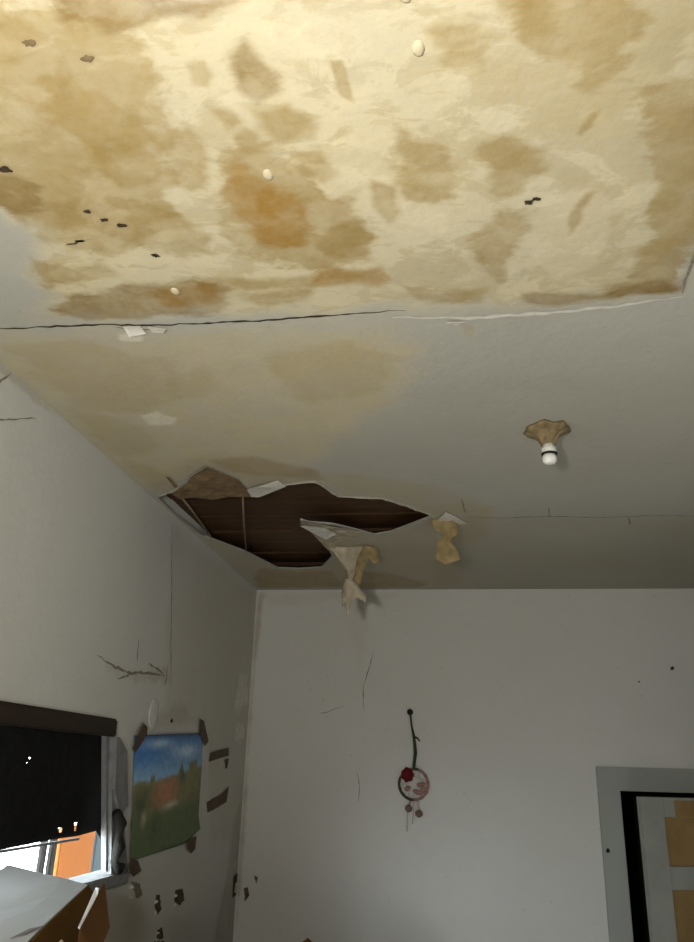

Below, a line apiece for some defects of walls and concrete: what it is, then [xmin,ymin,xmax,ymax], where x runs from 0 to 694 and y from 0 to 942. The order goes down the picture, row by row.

leakage [0,0,694,474]
crack [0,220,694,337]
flaking render [247,480,286,498]
flaking render [301,526,336,540]
crack [97,641,167,684]
peeling [153,895,161,915]
peeling [173,888,184,907]